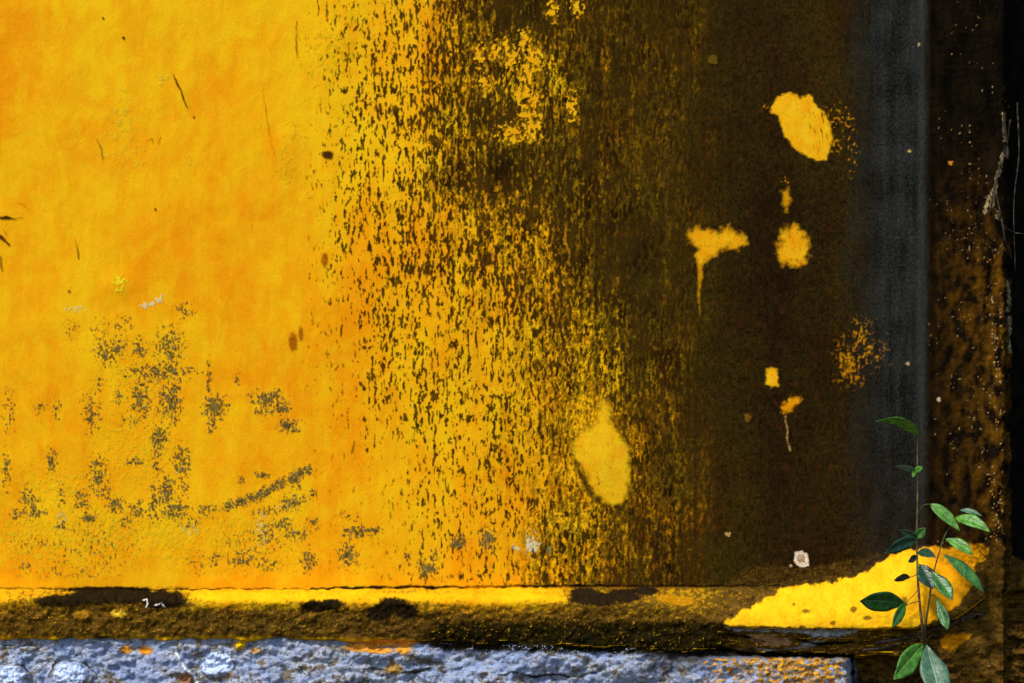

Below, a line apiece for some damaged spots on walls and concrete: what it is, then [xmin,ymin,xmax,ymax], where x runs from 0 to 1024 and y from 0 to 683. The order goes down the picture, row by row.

damp [343,75,371,156]
damp [335,154,378,257]
corrosion [289,327,302,350]
damp [356,356,386,409]
damp [396,310,466,479]
peeling [0,302,319,578]
damp [472,383,535,501]
damp [544,415,585,472]
peeling [335,513,383,567]
damp [417,480,442,540]
damp [459,526,522,585]
damp [480,494,523,537]